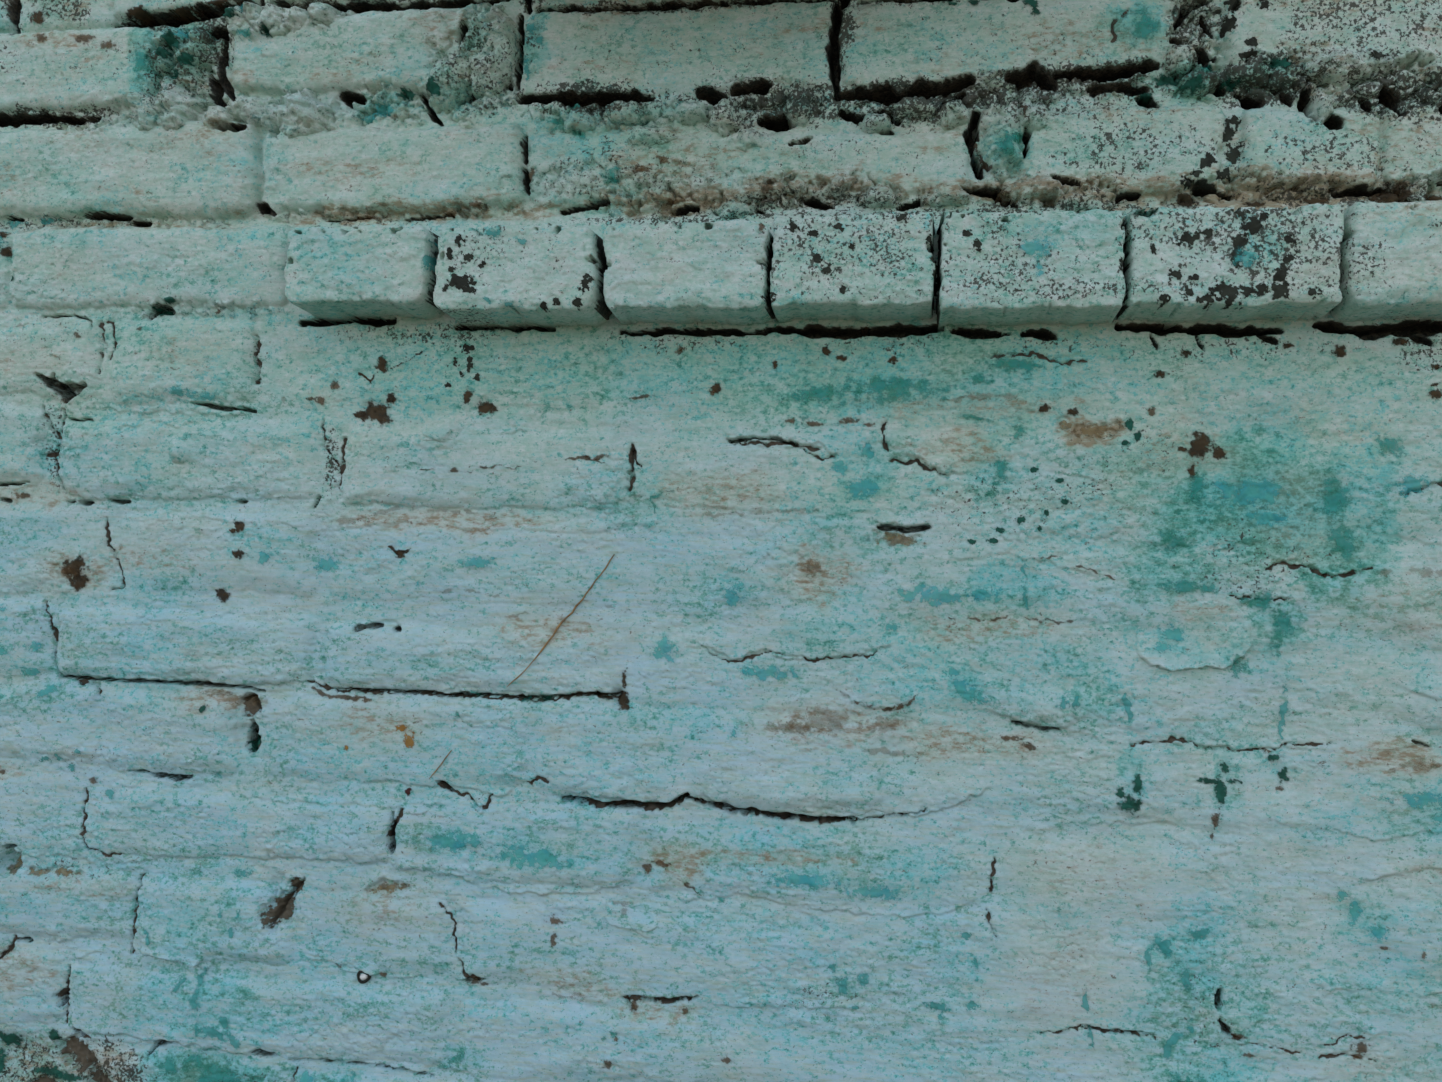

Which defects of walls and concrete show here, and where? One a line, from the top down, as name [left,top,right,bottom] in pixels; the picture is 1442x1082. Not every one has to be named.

peeling [1219,0,1272,62]
peeling [1180,115,1245,192]
peeling [442,234,486,293]
peeling [1154,208,1323,317]
leakage [1178,431,1289,526]
leakage [1388,475,1431,498]
leakage [1313,477,1361,563]
crack [1229,561,1373,601]
leakage [1240,591,1297,657]
crack [1130,736,1331,752]
crack [437,780,493,809]
crack [527,775,925,825]